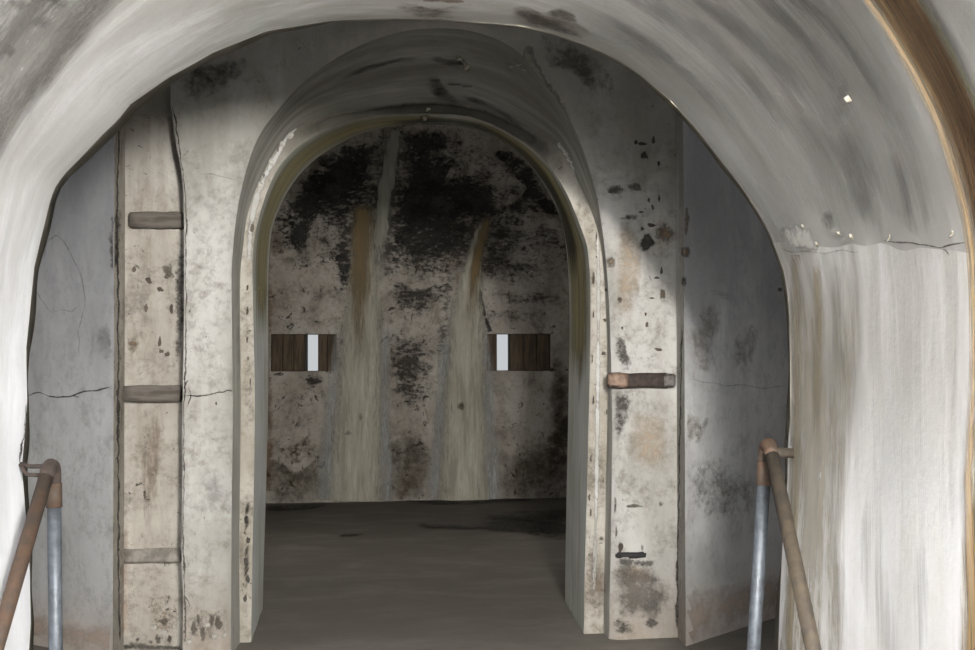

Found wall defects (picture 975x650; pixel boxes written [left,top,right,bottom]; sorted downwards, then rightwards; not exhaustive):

water stain [0,0,94,140]
water stain [311,80,544,151]
crack [884,240,965,255]
crack [19,131,121,639]
water stain [265,126,568,539]
rust [864,0,975,650]
water stain [615,559,664,633]